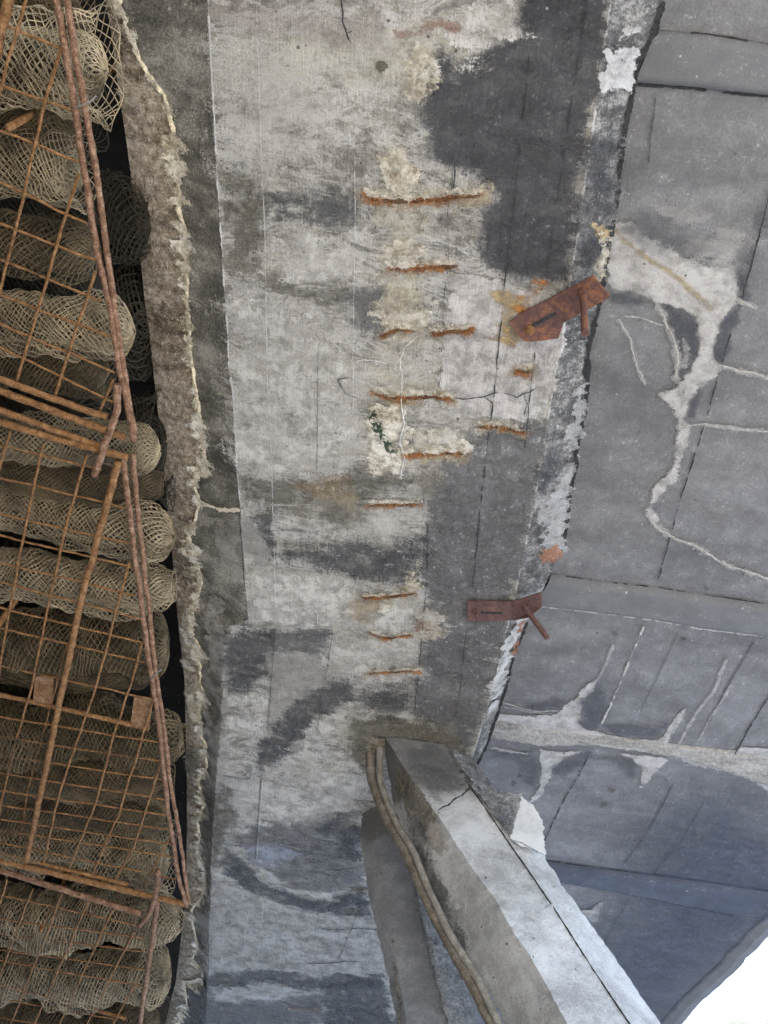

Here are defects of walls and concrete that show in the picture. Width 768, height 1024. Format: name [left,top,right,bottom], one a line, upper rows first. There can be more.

leakage [401,41,442,106]
peeling [597,26,641,94]
spalling [359,186,488,210]
spalling [385,256,458,274]
leakage [593,230,703,300]
spalling [379,321,476,339]
corrosion [489,280,547,347]
leakage [656,304,701,381]
leakage [714,281,751,361]
spalling [370,387,454,403]
leakage [108,0,366,1024]
leakage [339,704,528,771]